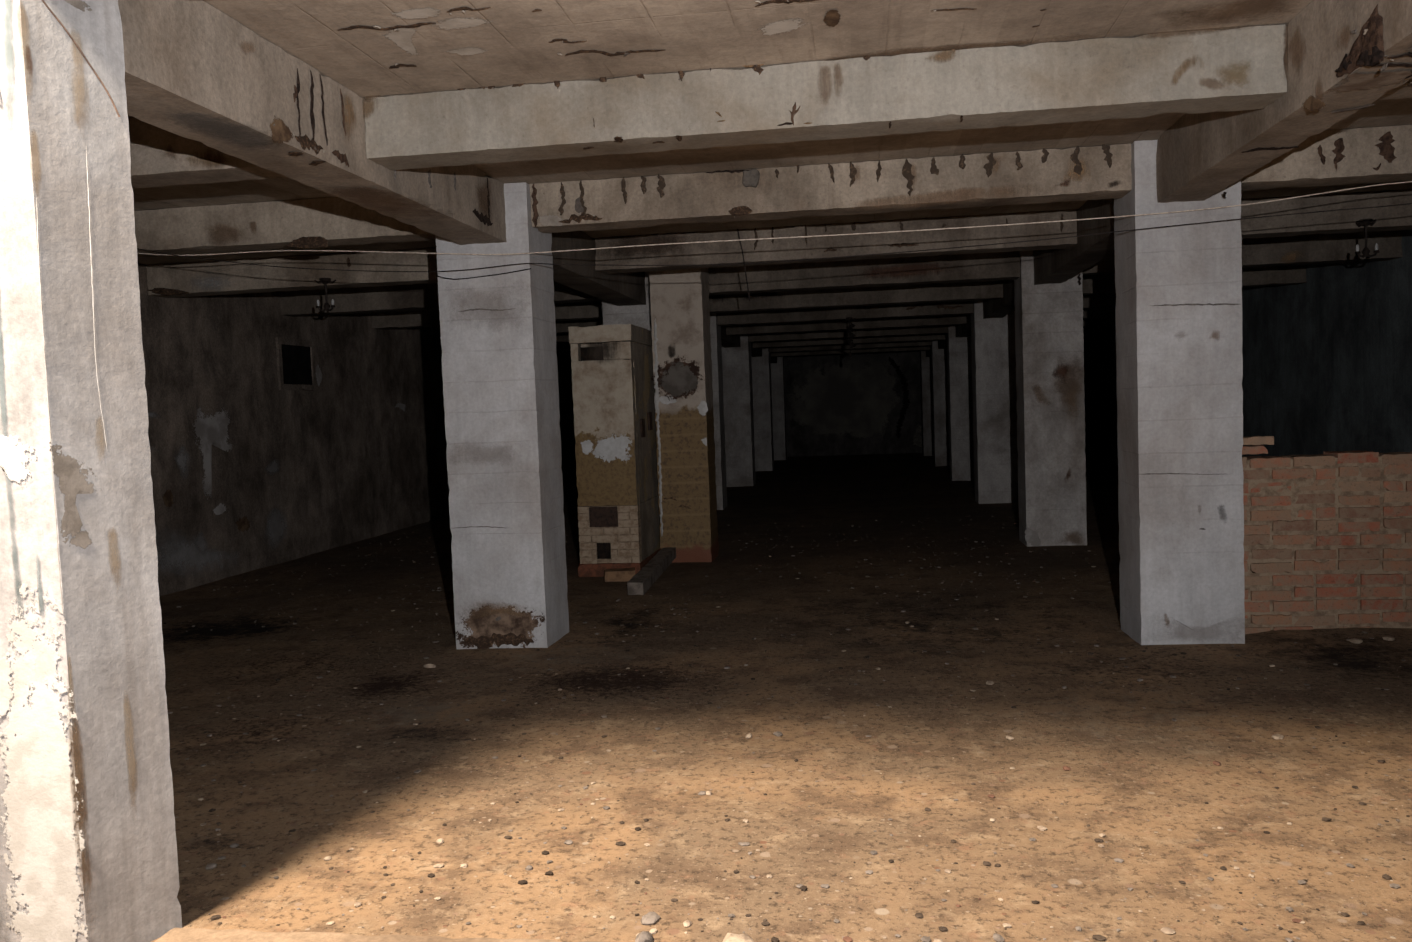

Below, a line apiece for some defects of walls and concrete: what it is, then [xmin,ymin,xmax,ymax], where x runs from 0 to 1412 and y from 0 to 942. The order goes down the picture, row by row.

leakage [3,0,14,107]
spalling [1330,4,1412,113]
spalling [651,346,708,416]
peeling [0,435,101,549]
peeling [581,433,632,463]
leakage [5,474,44,620]